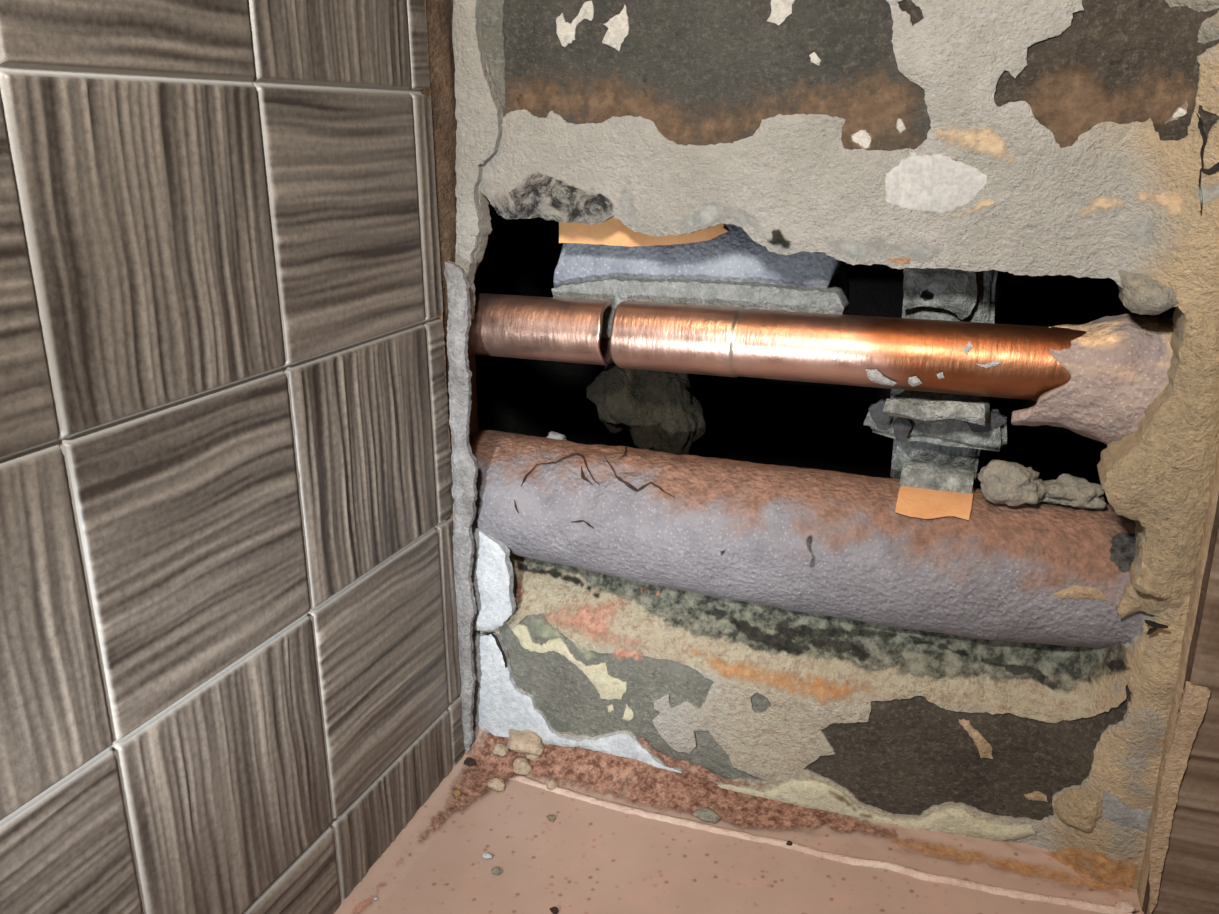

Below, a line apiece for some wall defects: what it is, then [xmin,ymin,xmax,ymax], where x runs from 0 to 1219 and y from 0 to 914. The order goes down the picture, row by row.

flaking render [490,172,613,224]
flaking render [481,0,931,151]
water stain [936,128,1007,157]
flaking render [994,0,1219,148]
water stain [517,557,1129,691]
flaking render [472,613,1131,841]